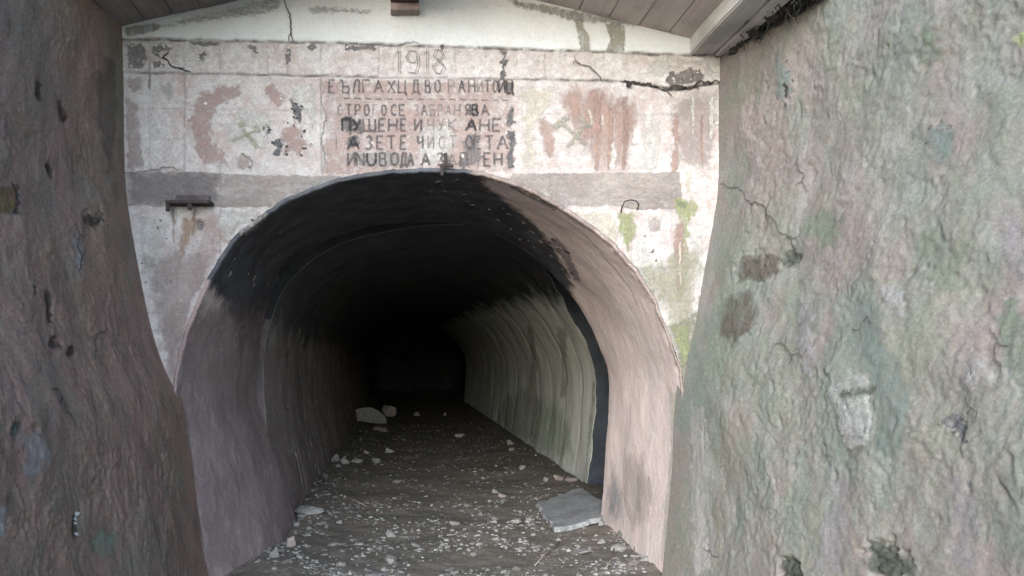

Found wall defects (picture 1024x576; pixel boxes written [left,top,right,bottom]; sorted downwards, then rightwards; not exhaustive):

crack [284,0,294,43]
peeling [127,41,171,91]
crack [148,47,191,90]
crack [573,56,719,96]
peeling [263,84,312,156]
crack [722,183,797,250]
spalling [782,250,801,267]
water stain [139,213,297,576]
water stain [473,171,716,576]
spalling [864,542,911,576]